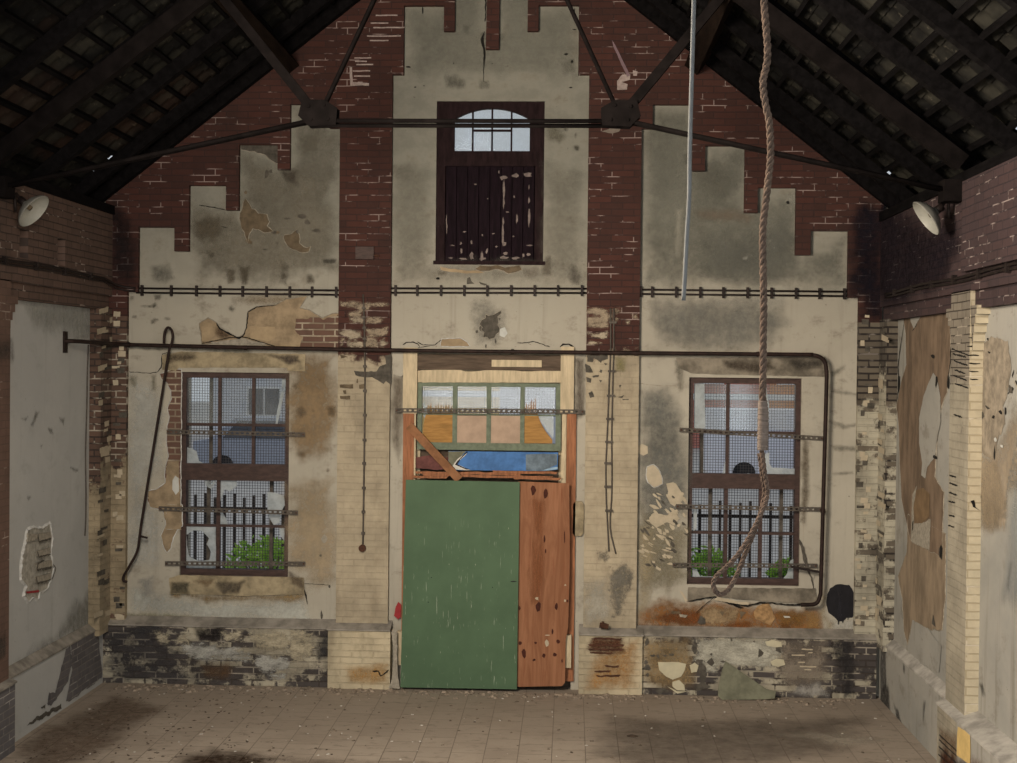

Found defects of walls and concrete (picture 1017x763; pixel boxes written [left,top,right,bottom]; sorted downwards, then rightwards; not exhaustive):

crack [481,0,493,83]
peeling [436,171,533,285]
peeling [199,296,392,400]
peeling [147,369,183,553]
peeling [637,444,690,570]
peeling [896,314,951,672]
peeling [971,336,1017,527]
spalling [19,521,56,604]
corrosion [588,637,692,693]
corrosion [639,601,820,629]
peeling [692,637,781,691]
corrosion [938,734,961,763]